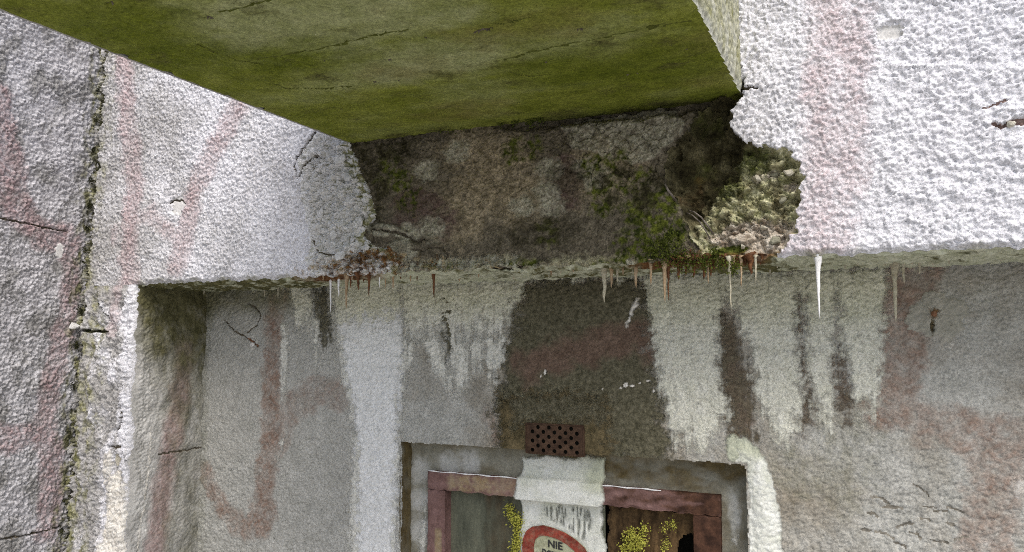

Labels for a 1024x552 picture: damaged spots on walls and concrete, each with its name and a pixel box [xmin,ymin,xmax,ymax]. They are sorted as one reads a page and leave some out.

crack [982,99,1007,109]
crack [294,131,322,177]
spalling [297,82,806,278]
rust [312,246,405,275]
crack [0,51,109,546]
crack [223,305,261,338]
water stain [279,255,889,552]
crack [158,446,201,456]